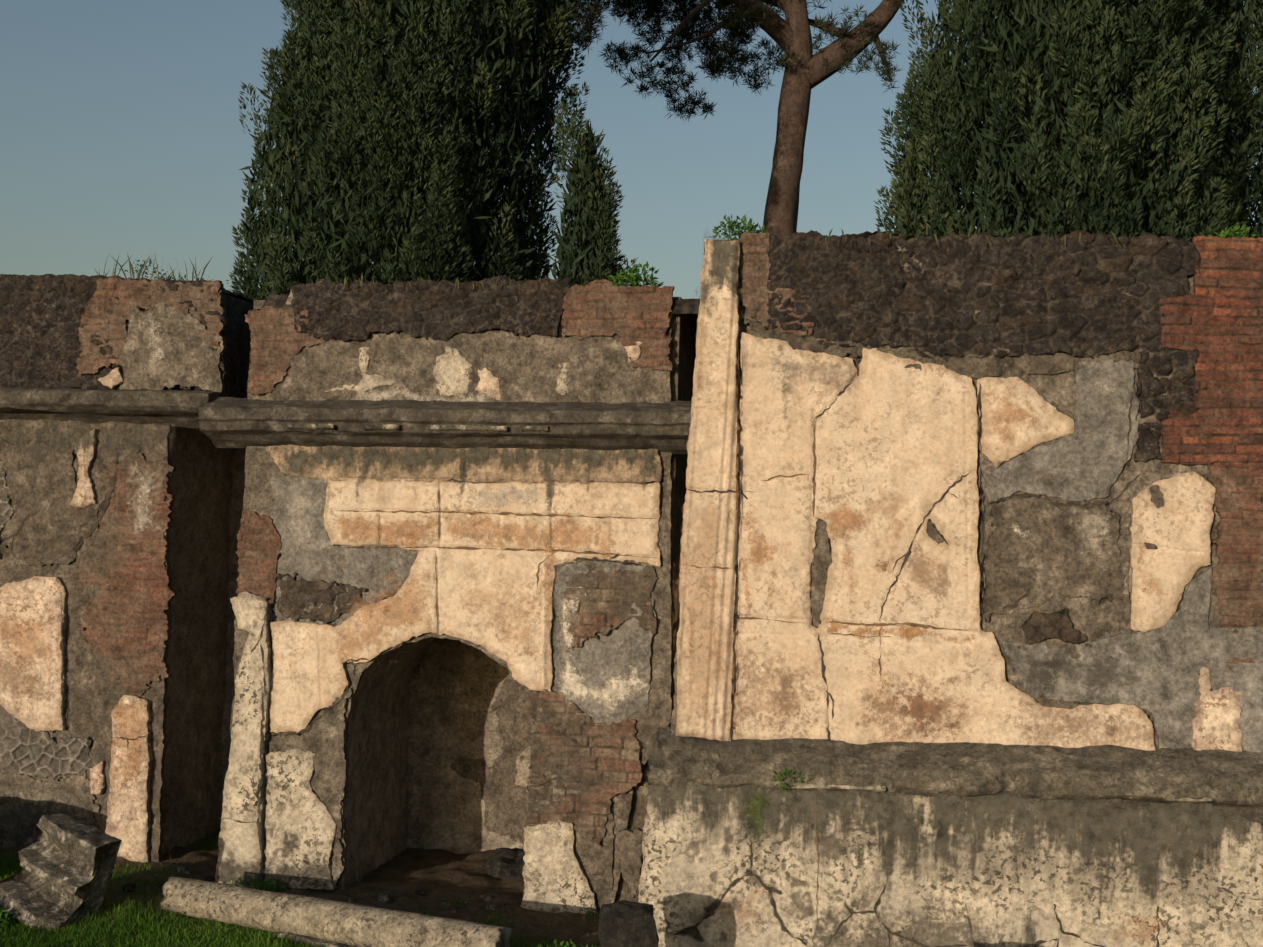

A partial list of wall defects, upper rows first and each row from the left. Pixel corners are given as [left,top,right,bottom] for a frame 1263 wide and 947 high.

spalling [990,361,1083,424]
damp [284,445,657,507]
crack [878,386,1140,683]
spalling [977,444,1131,684]
spalling [553,558,656,727]
crack [818,634,834,740]
damp [647,733,1263,899]
crack [1035,904,1105,947]
crack [1154,906,1162,947]